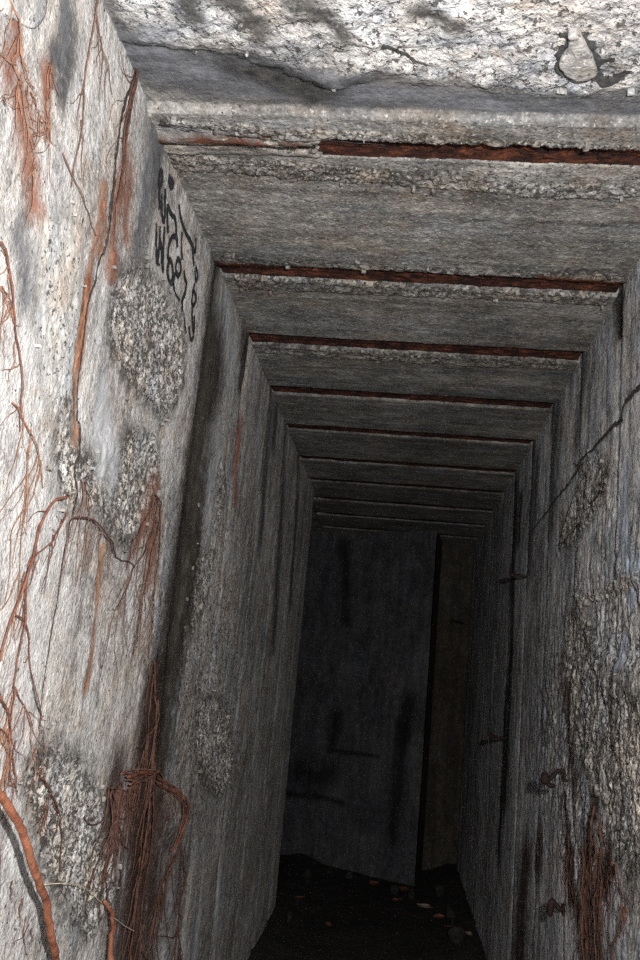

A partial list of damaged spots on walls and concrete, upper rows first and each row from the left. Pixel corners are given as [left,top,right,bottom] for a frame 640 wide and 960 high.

crack [529,384,640,545]